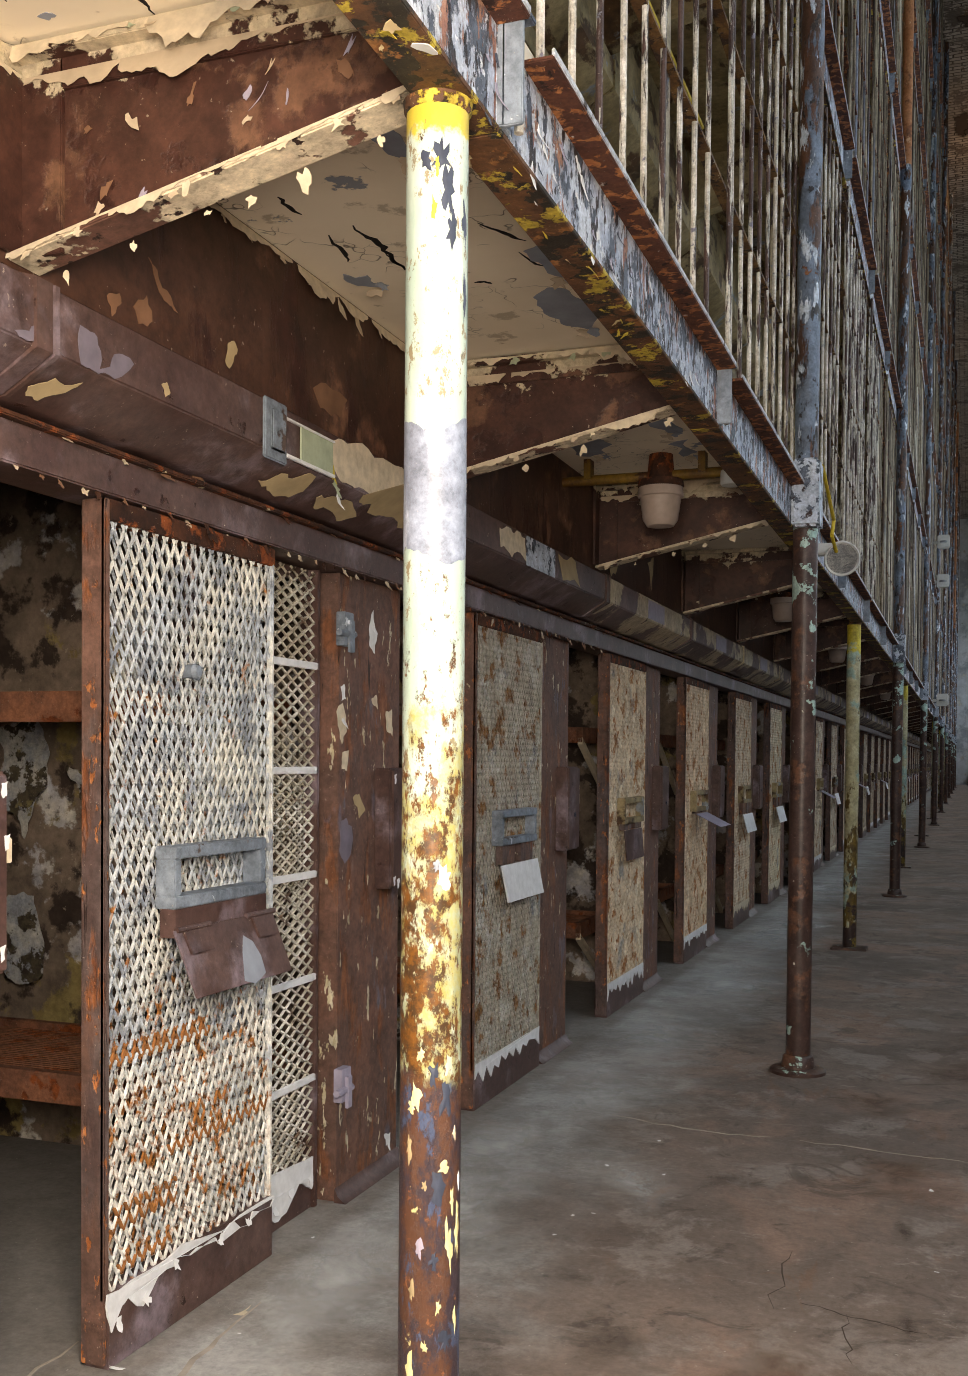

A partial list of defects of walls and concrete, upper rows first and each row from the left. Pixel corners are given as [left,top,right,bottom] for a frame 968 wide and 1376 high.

crack [138,0,155,15]
peeling [0,0,344,106]
peeling [5,85,407,261]
crack [277,197,302,215]
crack [328,225,406,270]
peeling [371,130,472,317]
crack [478,223,543,266]
peeling [258,439,404,529]
corrosion [109,1017,210,1070]
corrosion [166,1091,268,1156]
corrosion [109,1176,178,1274]
peeling [105,1156,313,1333]